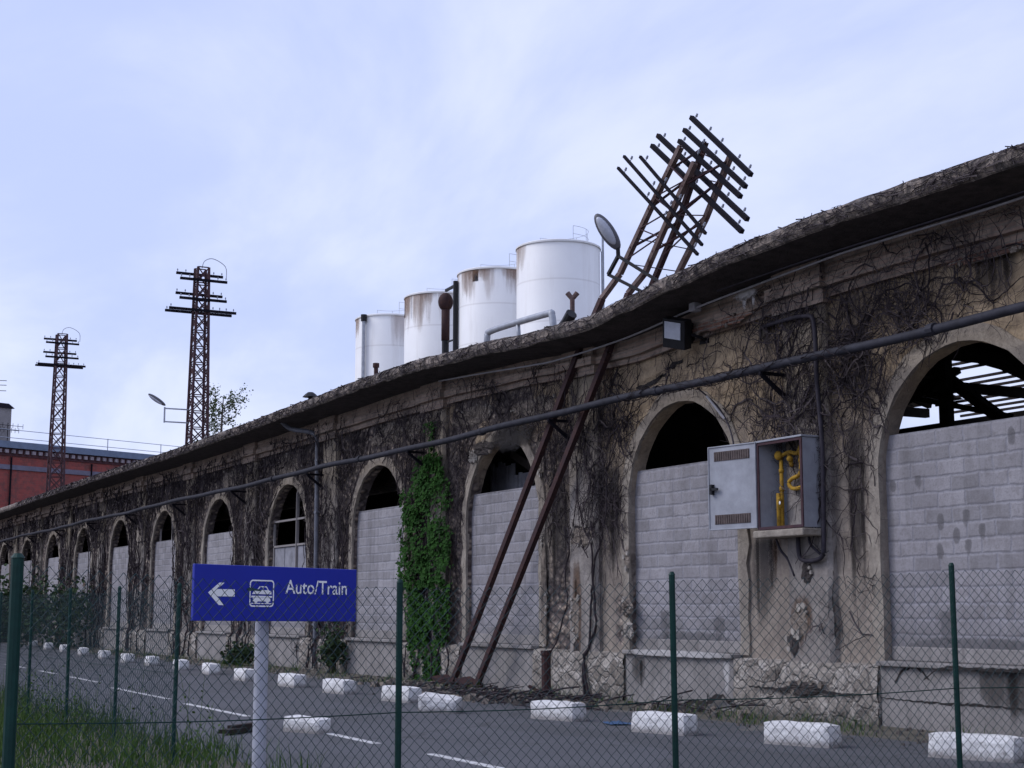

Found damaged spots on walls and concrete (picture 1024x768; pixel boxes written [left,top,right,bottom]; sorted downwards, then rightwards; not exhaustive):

flaking render [784,602,809,658]
spalling [783,679,824,697]